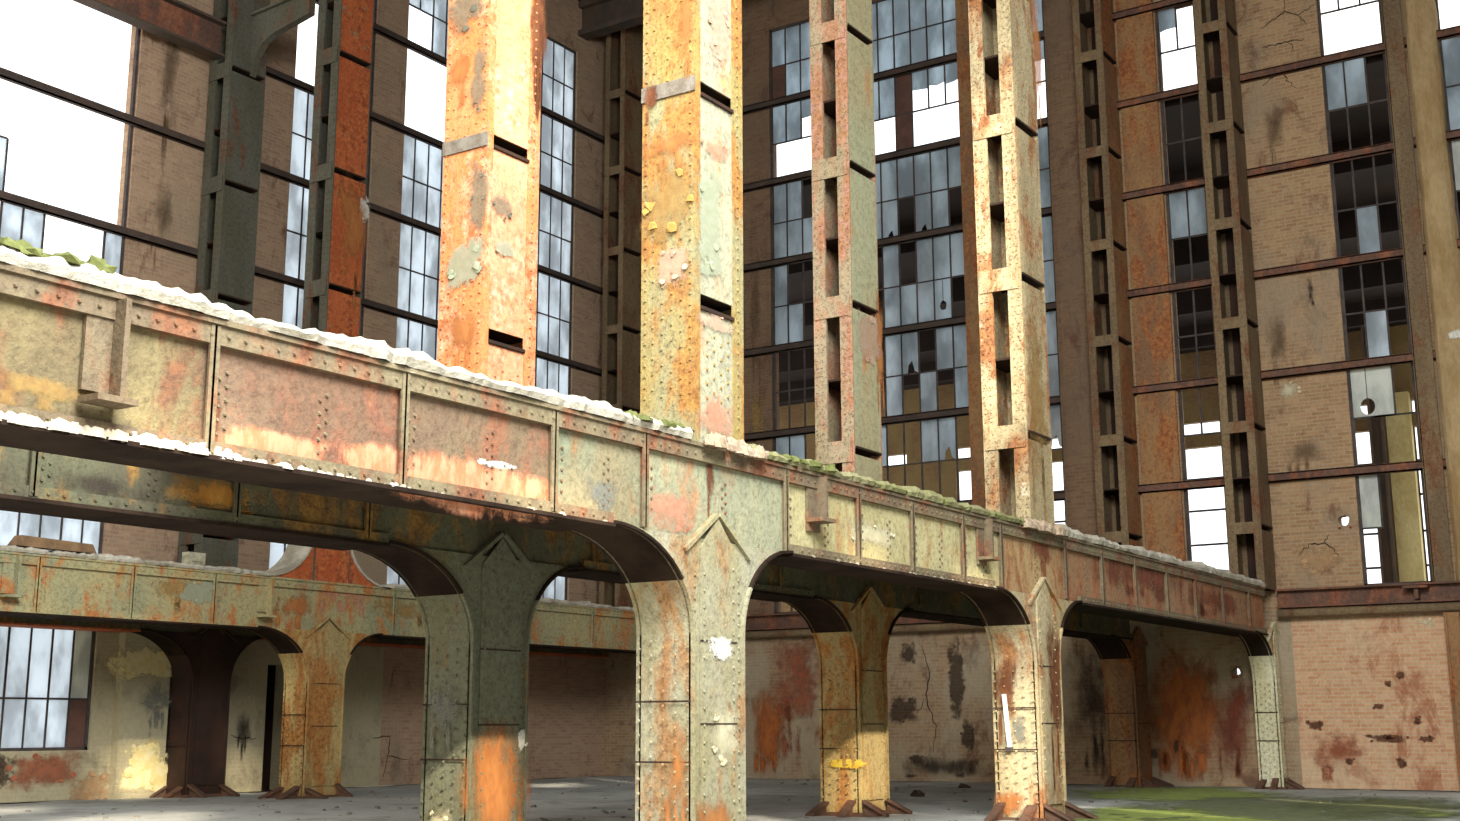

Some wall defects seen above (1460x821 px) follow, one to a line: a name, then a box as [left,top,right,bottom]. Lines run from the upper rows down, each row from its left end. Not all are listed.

rust [452,56,469,105]
rust [531,0,547,120]
crack [1260,1,1313,88]
peeling [447,162,513,289]
peeling [642,139,728,286]
rust [447,315,474,366]
rust [215,402,326,460]
rust [343,443,549,518]
rust [754,644,817,772]
rust [1149,656,1247,780]
rust [465,729,531,821]